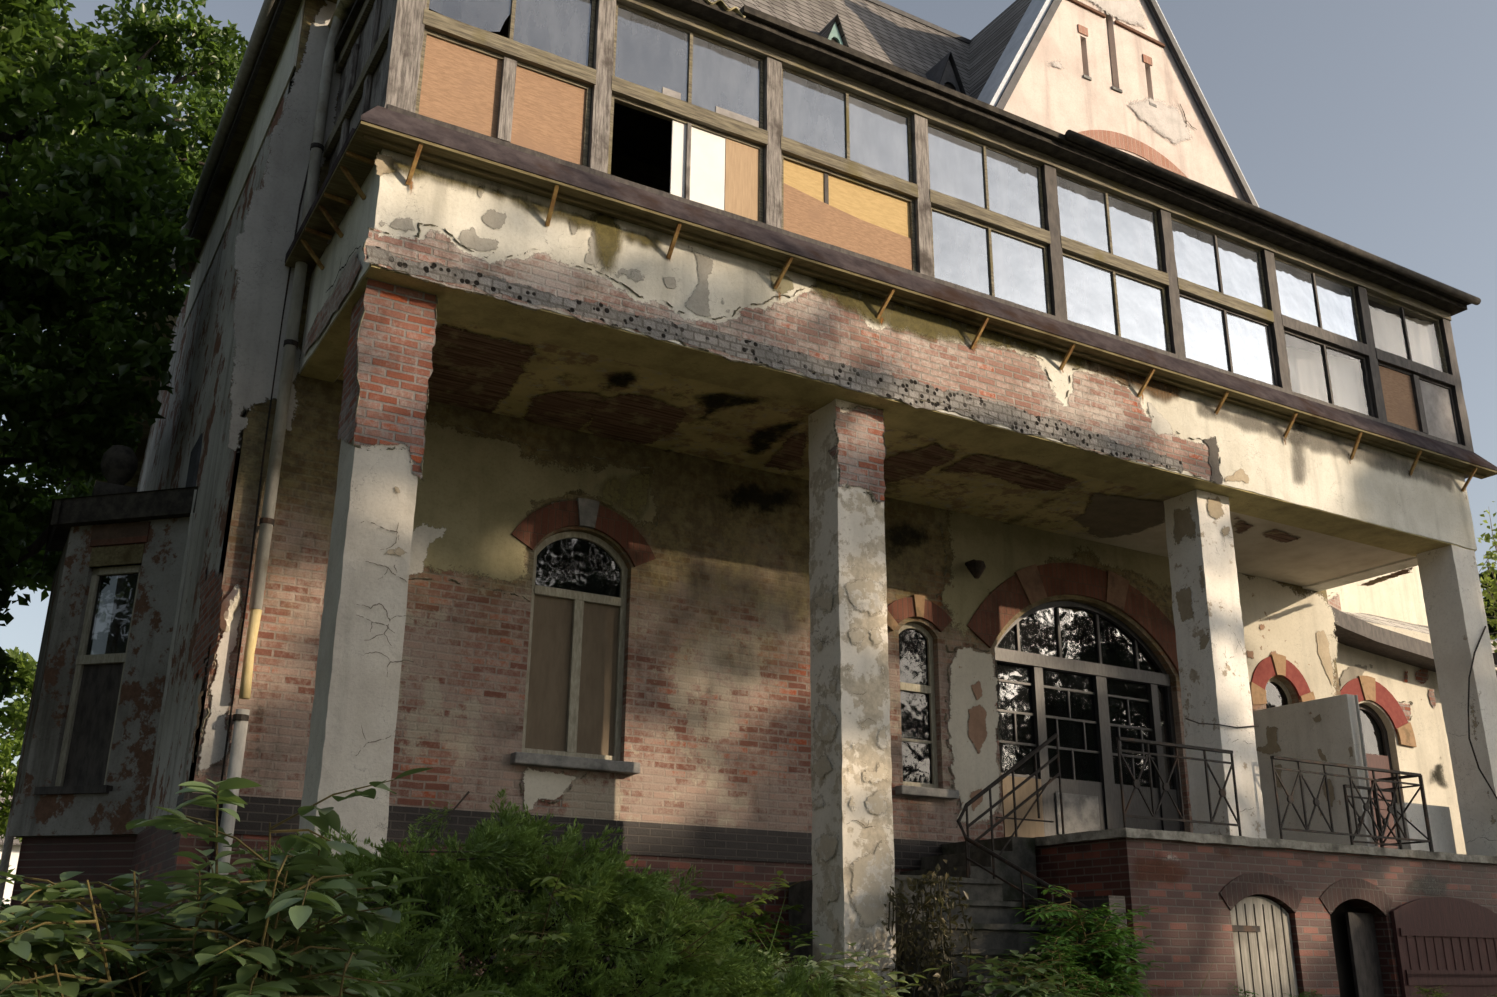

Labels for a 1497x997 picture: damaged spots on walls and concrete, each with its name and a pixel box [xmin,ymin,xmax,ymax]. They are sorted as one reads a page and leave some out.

water stain [745,420,802,455]
water stain [722,483,800,513]
flaking render [337,189,1300,829]
crack [357,521,427,677]
peeling [849,840,894,928]